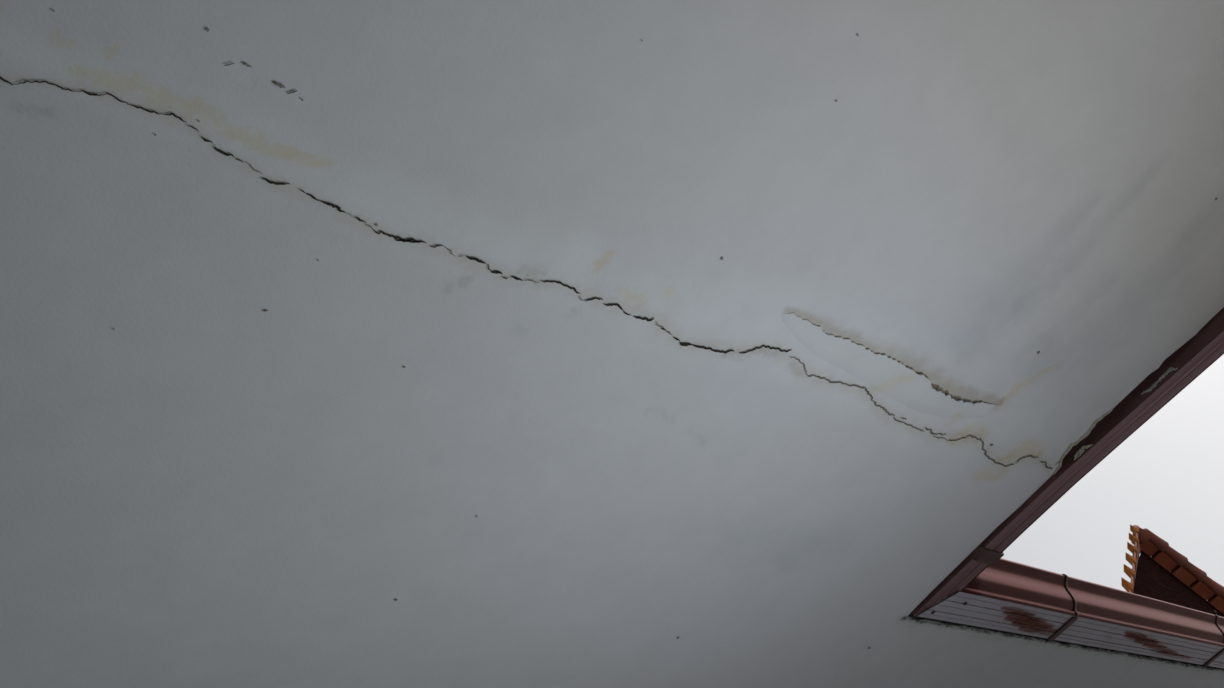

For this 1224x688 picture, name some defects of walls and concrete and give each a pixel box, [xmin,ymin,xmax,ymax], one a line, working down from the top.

crack [0,76,1059,470]